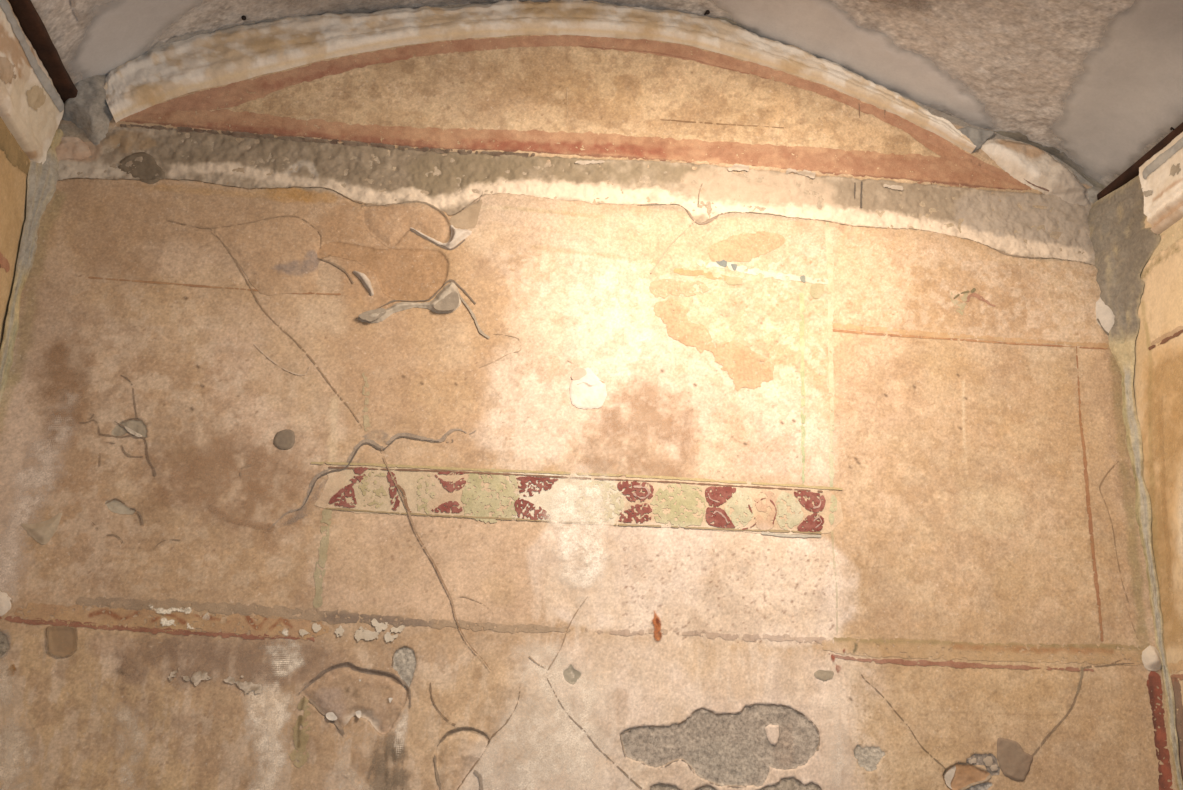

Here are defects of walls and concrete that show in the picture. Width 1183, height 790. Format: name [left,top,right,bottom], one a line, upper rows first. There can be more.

flaking render [58,124,1095,339]
crack [470,334,521,372]
crack [214,233,493,670]
crack [430,683,456,725]
crack [457,691,520,790]
crack [529,598,642,789]
flaking render [620,704,822,790]
crack [861,674,946,769]